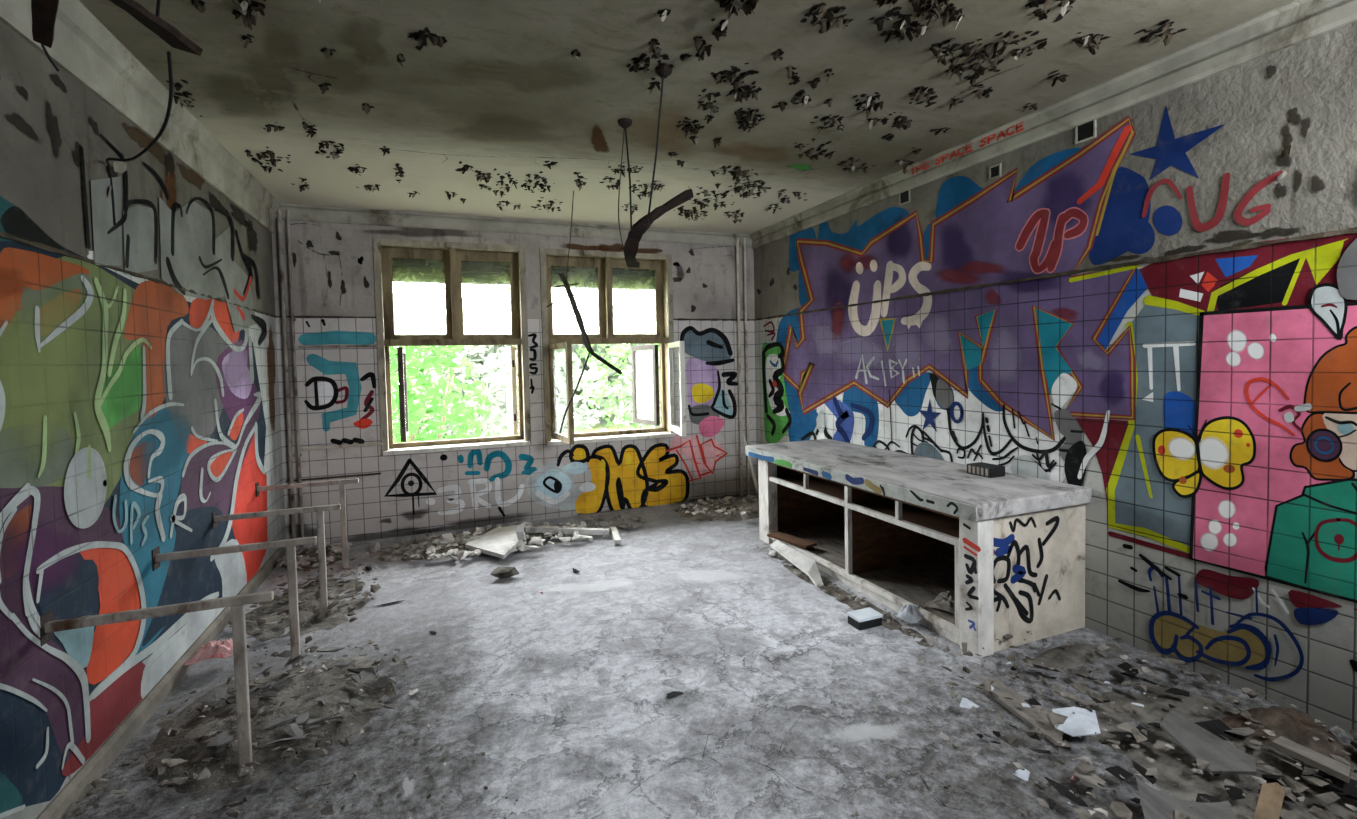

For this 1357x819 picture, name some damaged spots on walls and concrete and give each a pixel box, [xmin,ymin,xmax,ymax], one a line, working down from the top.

peeling [397,27,447,67]
peeling [1072,32,1110,55]
peeling [1134,19,1187,46]
peeling [626,0,1076,175]
peeling [4,101,81,167]
peeling [122,123,258,253]
peeling [244,122,309,192]
peeling [302,122,380,193]
peeling [380,146,420,198]
peeling [455,161,563,213]
peeling [573,165,665,214]
peeling [673,165,808,223]